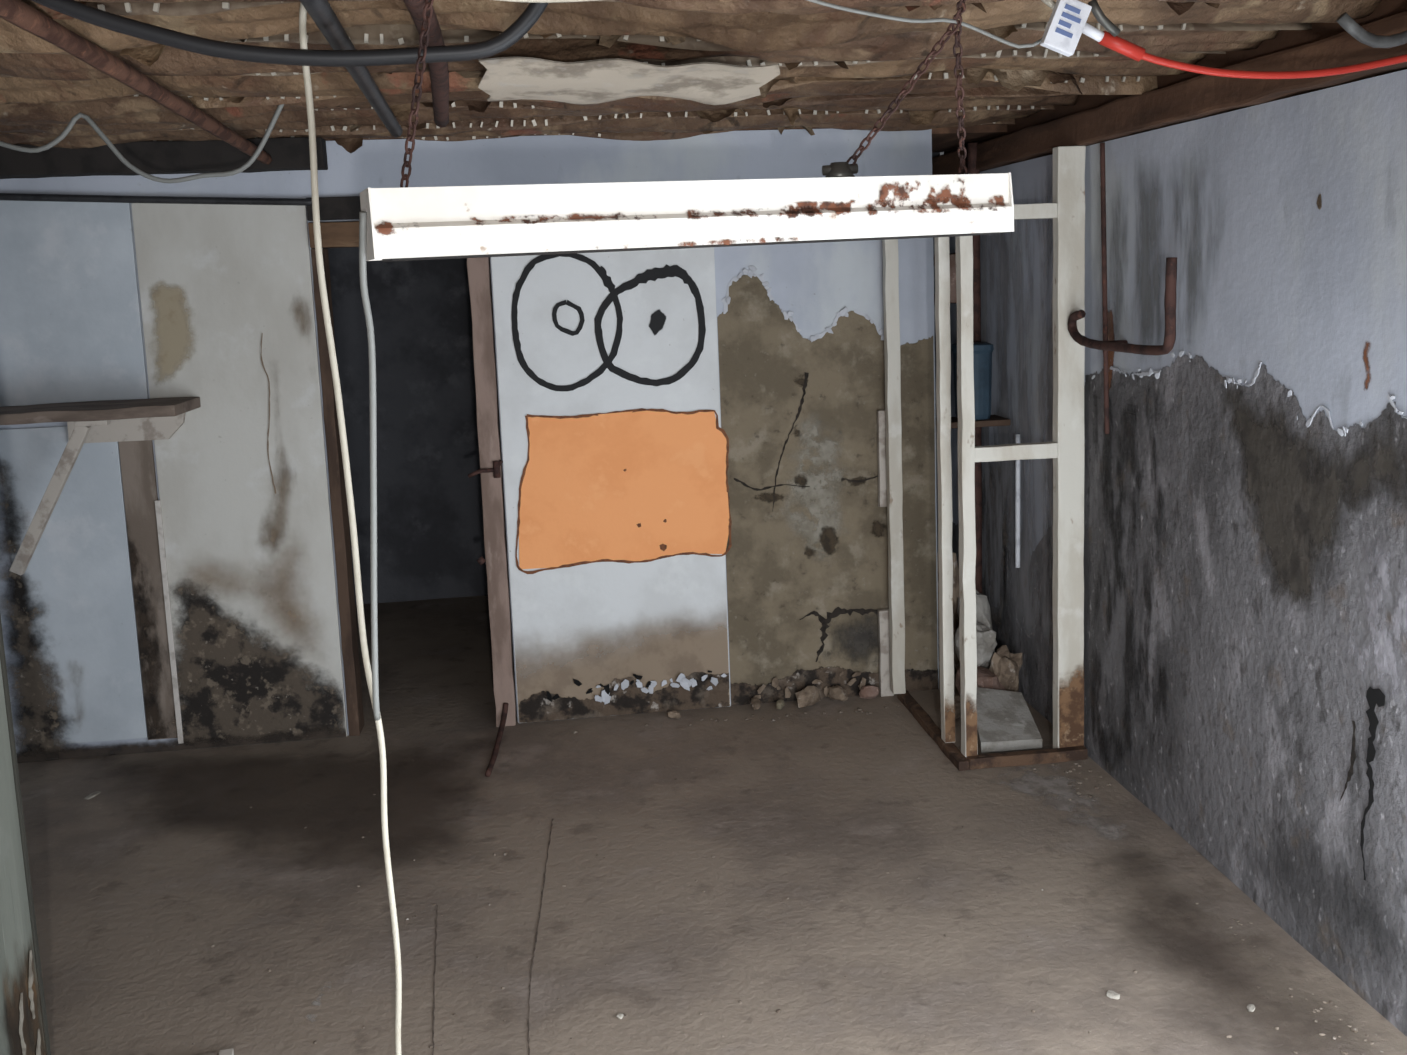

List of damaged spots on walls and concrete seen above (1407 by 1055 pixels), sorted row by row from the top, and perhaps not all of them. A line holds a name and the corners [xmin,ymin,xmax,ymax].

rust [375,222,394,235]
rust [472,213,656,225]
rust [680,237,797,247]
rust [687,179,1005,219]
crack [734,372,878,512]
damp [266,469,288,547]
peeling [519,266,959,723]
damp [128,540,345,743]
peeling [982,461,1053,724]
peeling [1083,351,1407,1037]
damp [125,756,462,855]